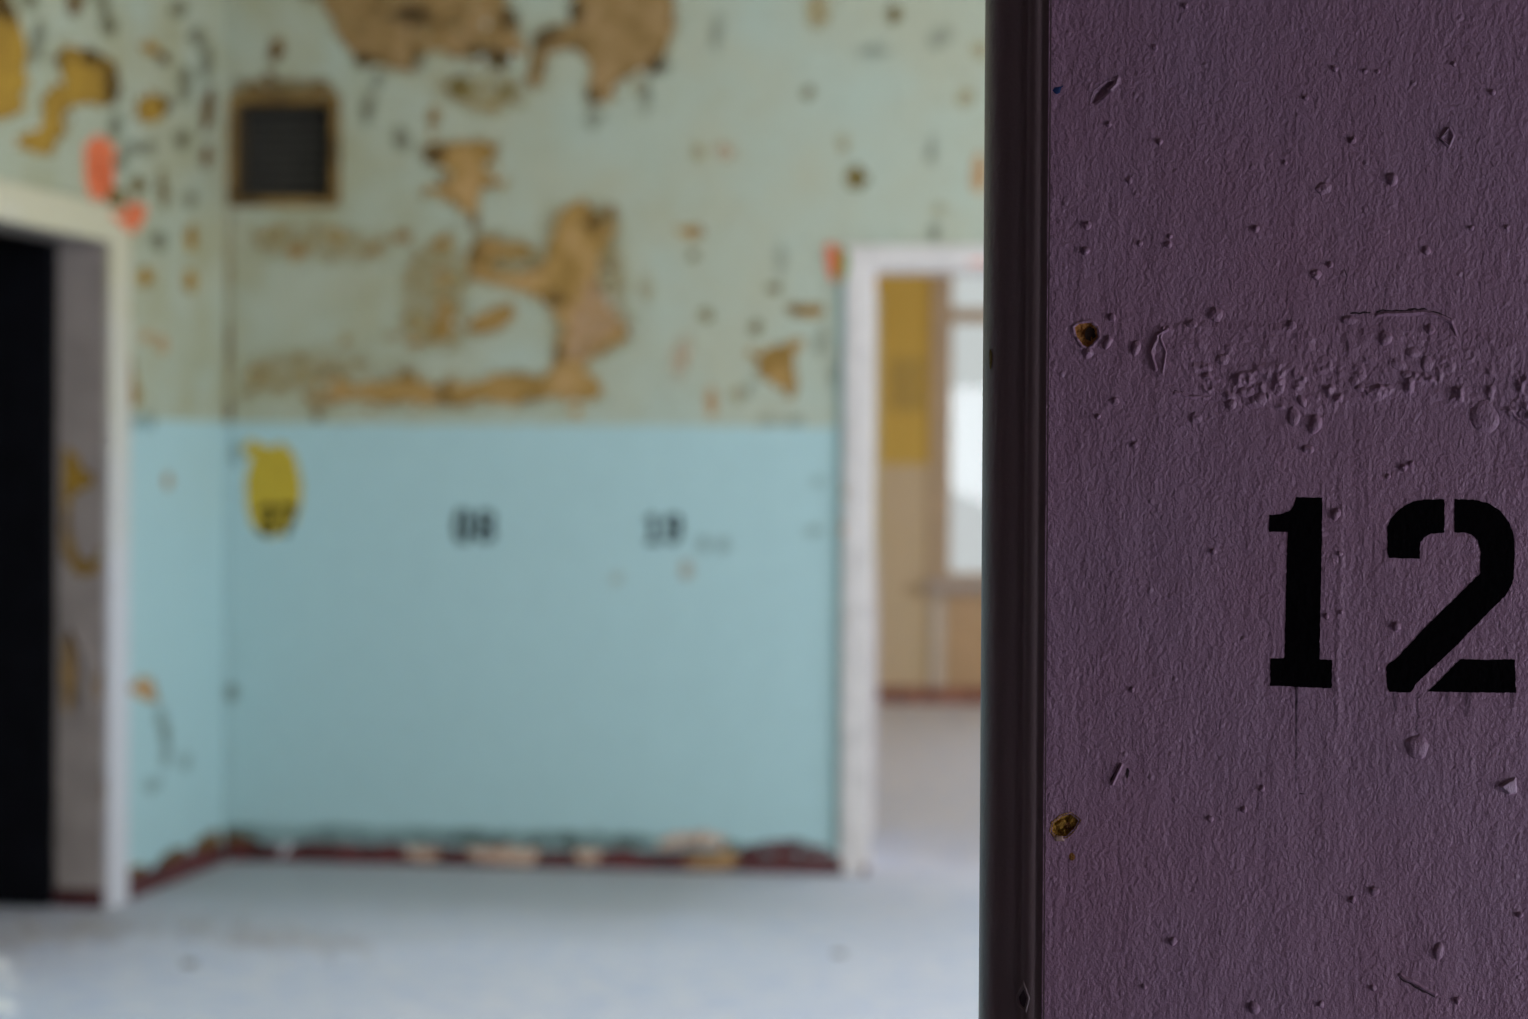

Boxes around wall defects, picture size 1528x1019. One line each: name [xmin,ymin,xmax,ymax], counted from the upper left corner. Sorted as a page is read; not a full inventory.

peeling [0,0,172,157]
peeling [263,37,285,86]
peeling [304,0,676,104]
peeling [304,108,635,422]